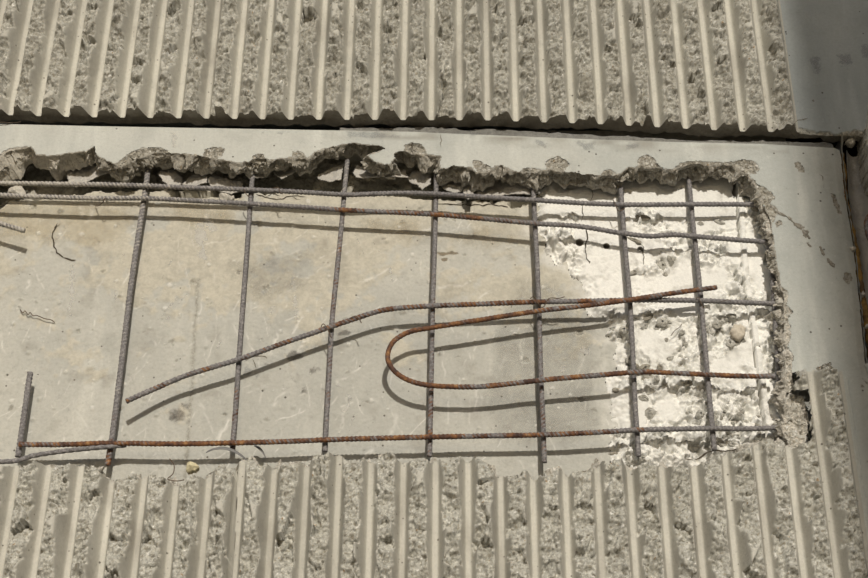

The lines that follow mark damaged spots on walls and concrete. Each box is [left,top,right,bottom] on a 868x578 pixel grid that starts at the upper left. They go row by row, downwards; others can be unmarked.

spalling [0,143,809,457]
spalling [785,105,868,215]